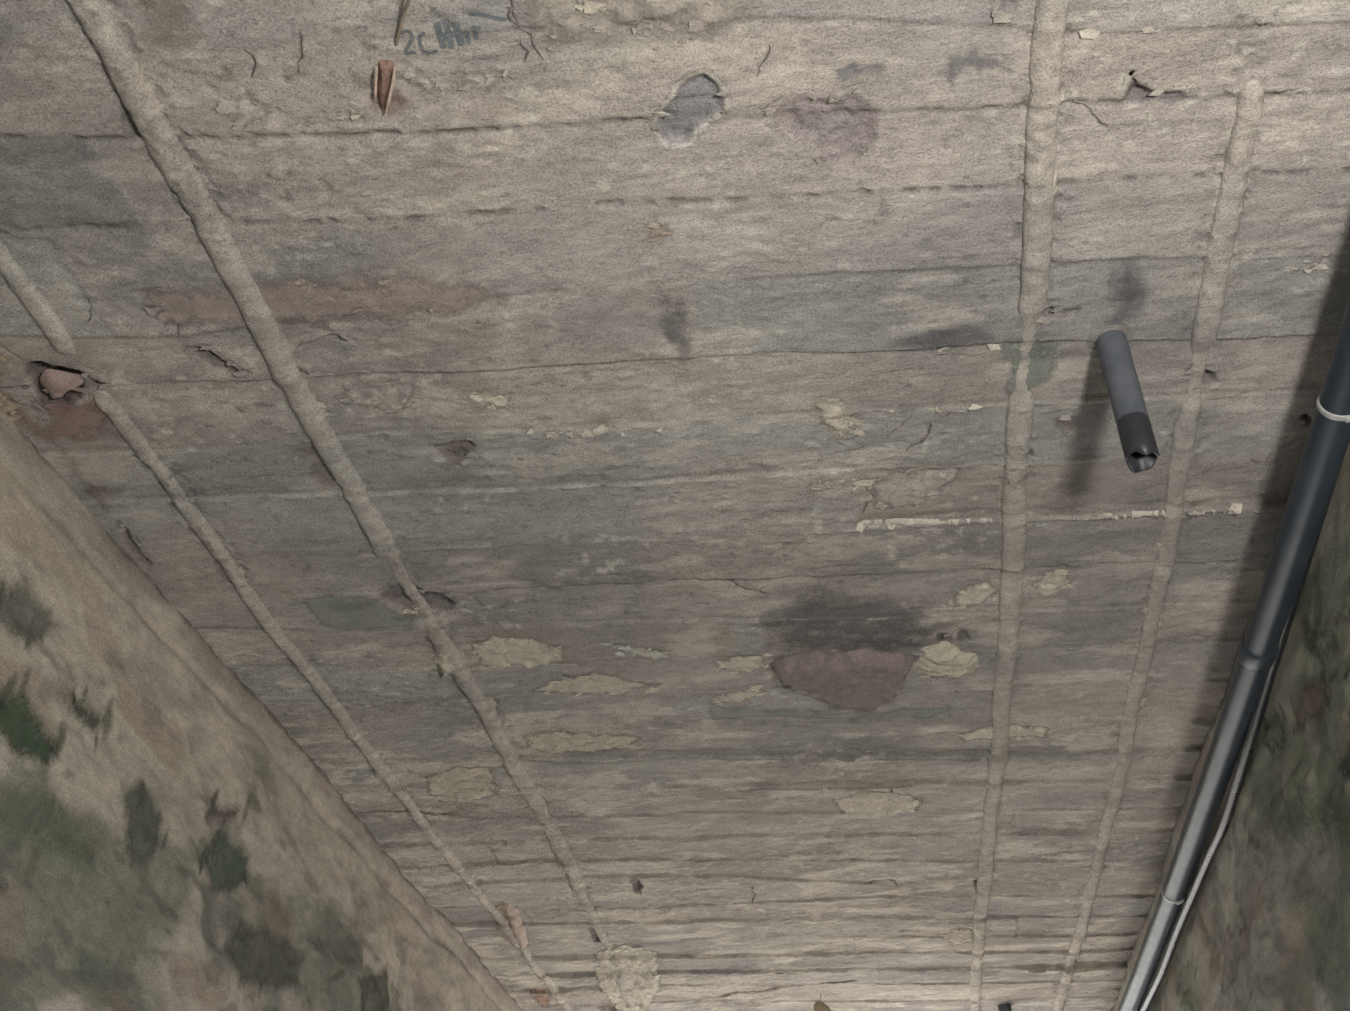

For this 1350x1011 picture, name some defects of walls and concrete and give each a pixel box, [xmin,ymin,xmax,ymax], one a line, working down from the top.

crack [506,0,544,62]
spalling [651,69,732,150]
spalling [0,354,114,422]
crack [844,342,1004,514]